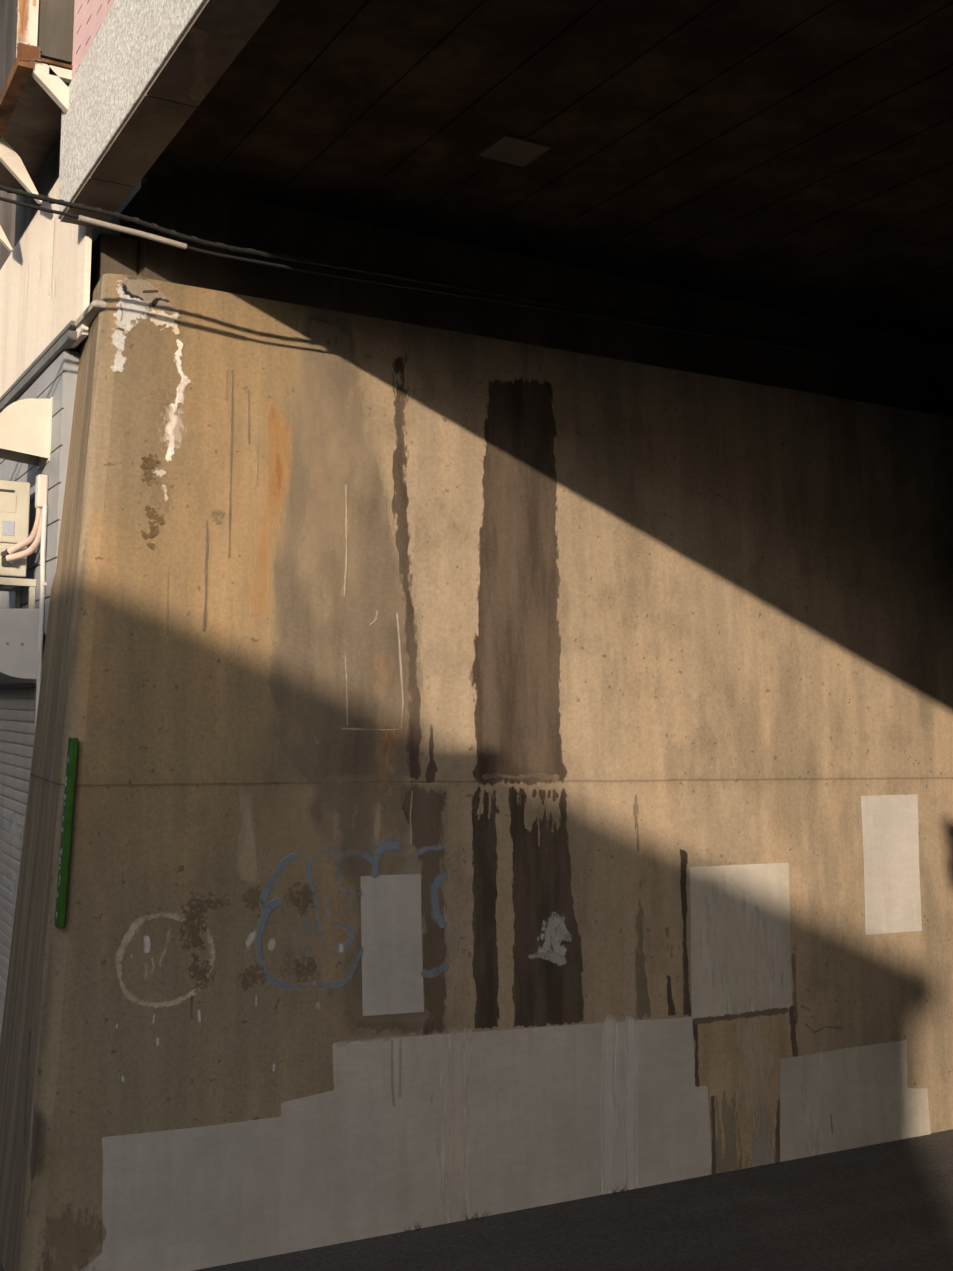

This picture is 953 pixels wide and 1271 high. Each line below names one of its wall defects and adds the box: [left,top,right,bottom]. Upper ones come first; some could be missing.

rust [16,0,40,61]
water stain [471,378,584,1029]